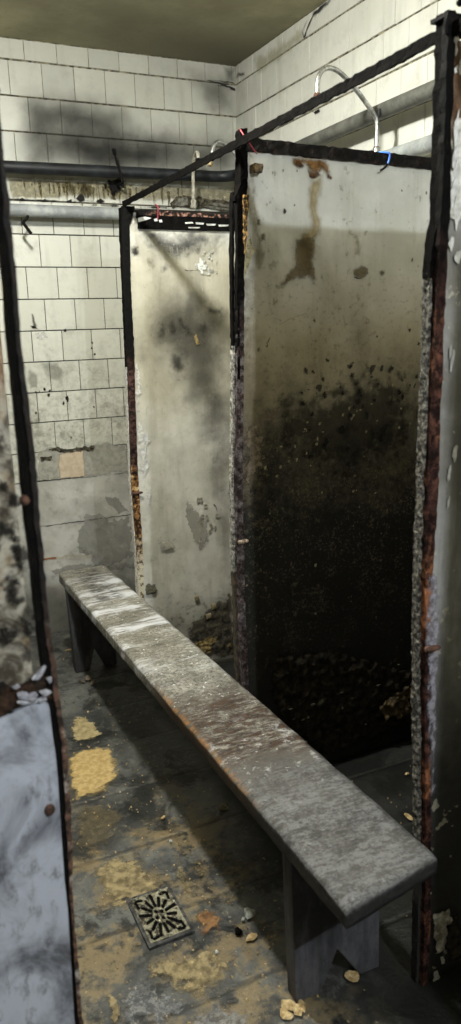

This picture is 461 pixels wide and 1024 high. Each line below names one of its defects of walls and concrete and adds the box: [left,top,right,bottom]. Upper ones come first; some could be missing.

water stain [10,178,233,205]
corrosion [282,158,332,285]
peeling [40,445,95,479]
water stain [280,362,418,477]